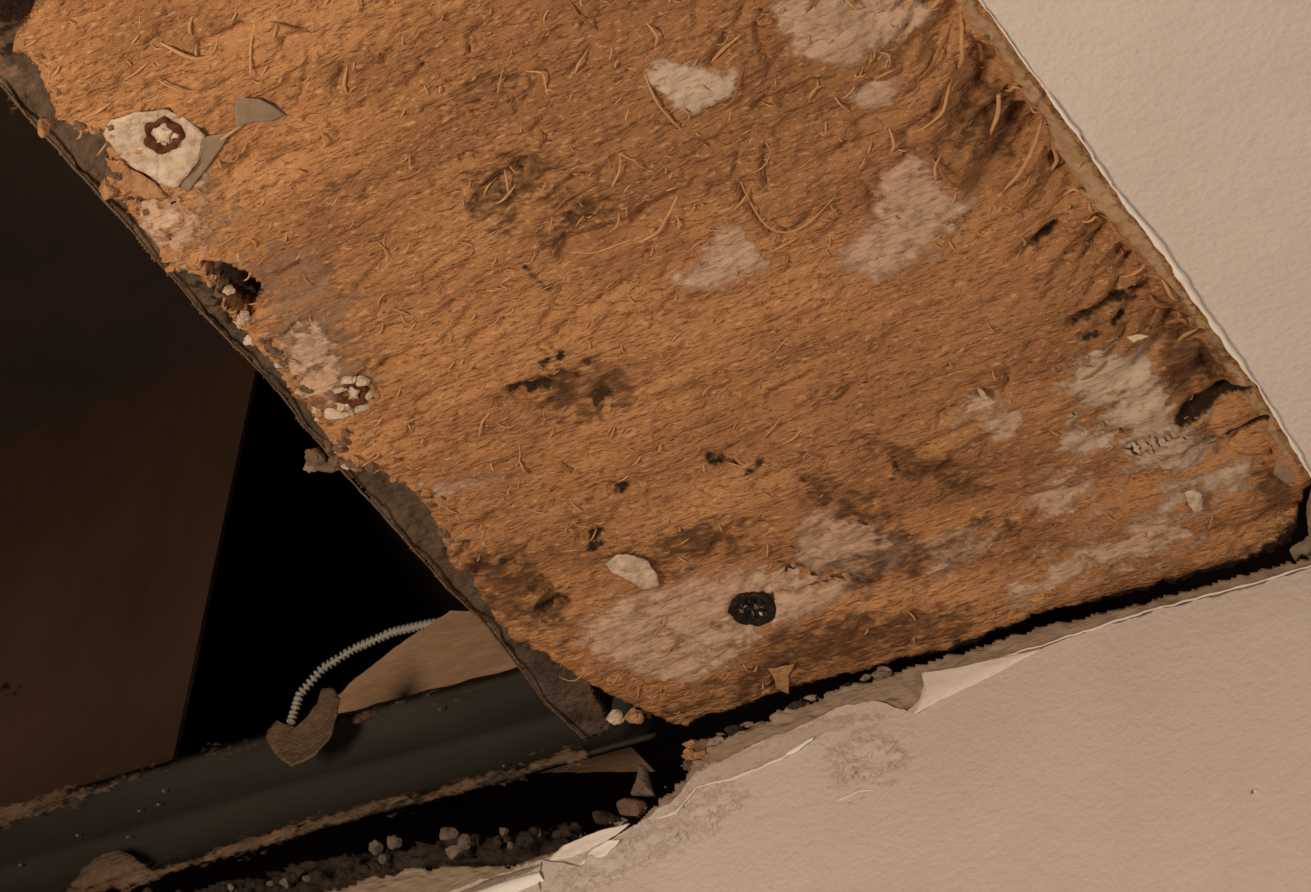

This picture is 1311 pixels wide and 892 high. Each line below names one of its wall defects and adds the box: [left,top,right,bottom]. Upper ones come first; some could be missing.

water stain [0,0,37,93]
peeling [772,0,938,64]
water stain [952,78,1019,160]
peeling [836,153,976,285]
peeling [280,317,373,419]
water stain [1158,302,1226,396]
peeling [1004,341,1260,608]
water stain [660,516,752,574]
peeling [559,502,999,685]
water stain [1082,518,1298,605]
water stain [734,602,983,702]
flaking render [183,556,1311,892]